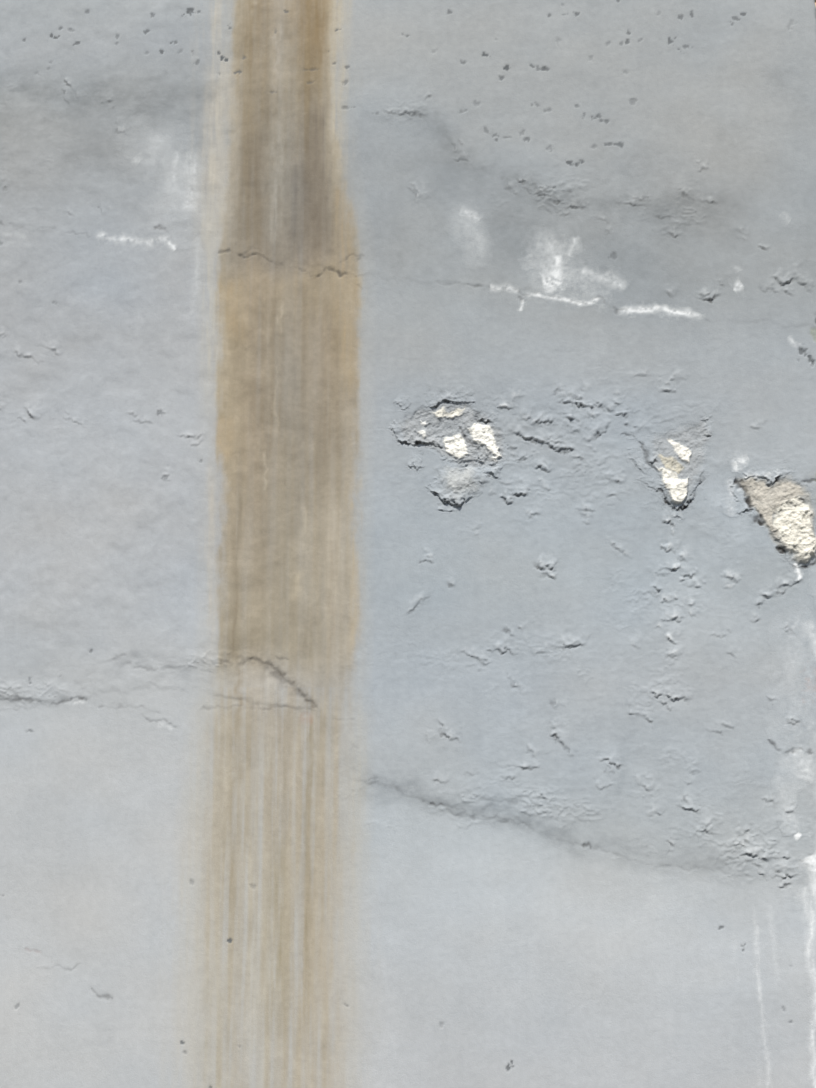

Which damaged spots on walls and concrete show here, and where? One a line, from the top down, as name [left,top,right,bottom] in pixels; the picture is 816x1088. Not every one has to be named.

efflorescence [443,199,495,270]
leakage [517,224,634,314]
peeling [662,271,729,306]
peeling [757,258,816,299]
spalling [385,360,816,665]
peeling [446,613,593,700]
crack [0,647,733,877]
leakage [763,556,816,1088]